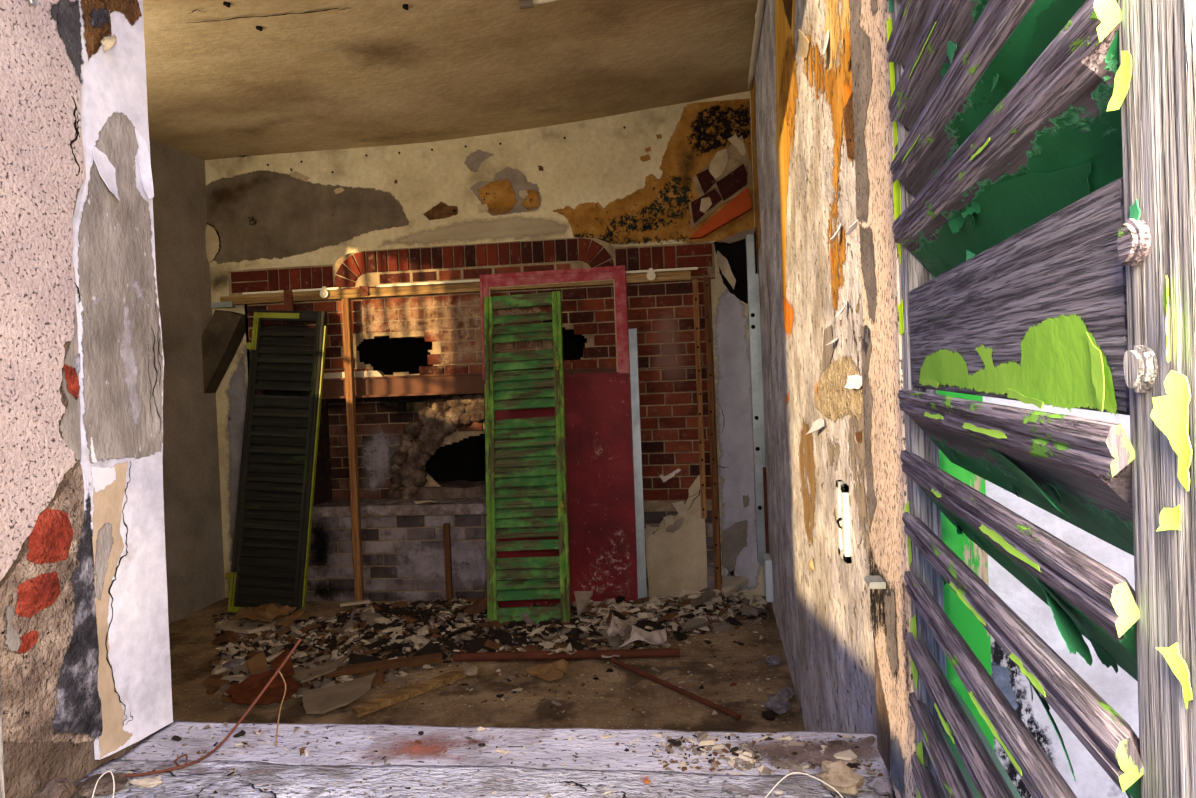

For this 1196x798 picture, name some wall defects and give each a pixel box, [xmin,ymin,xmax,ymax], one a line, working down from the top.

spalling [50,0,142,84]
peeling [206,76,761,304]
peeling [777,0,895,568]
peeling [893,180,901,220]
peeling [0,112,164,758]